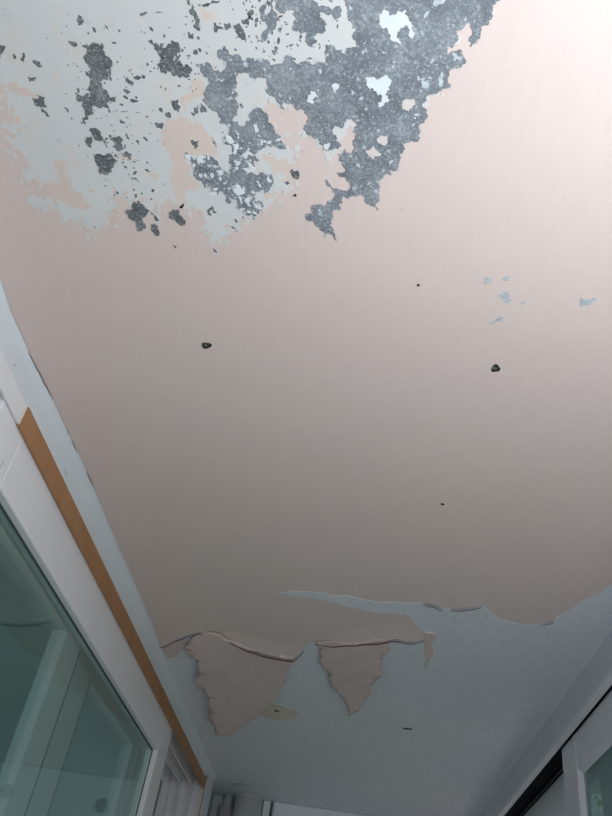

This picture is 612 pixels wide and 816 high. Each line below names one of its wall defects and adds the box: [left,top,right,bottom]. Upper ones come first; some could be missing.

peeling [0,0,500,253]
peeling [157,585,612,816]